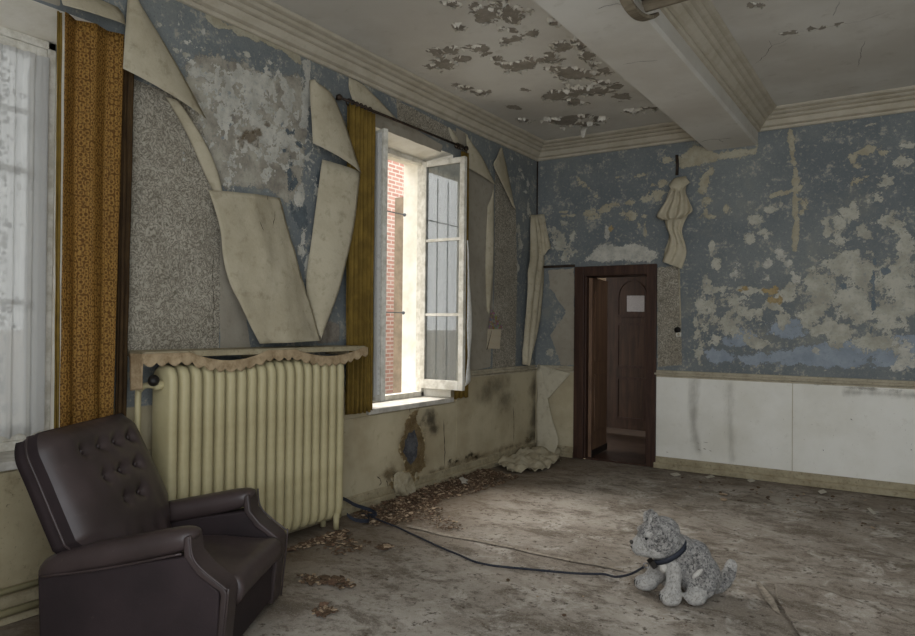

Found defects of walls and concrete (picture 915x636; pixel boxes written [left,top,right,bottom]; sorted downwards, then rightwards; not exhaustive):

peeling [422,0,659,138]
peeling [171,13,322,279]
peeling [660,145,758,220]
peeling [692,129,915,373]
spalling [318,321,340,344]